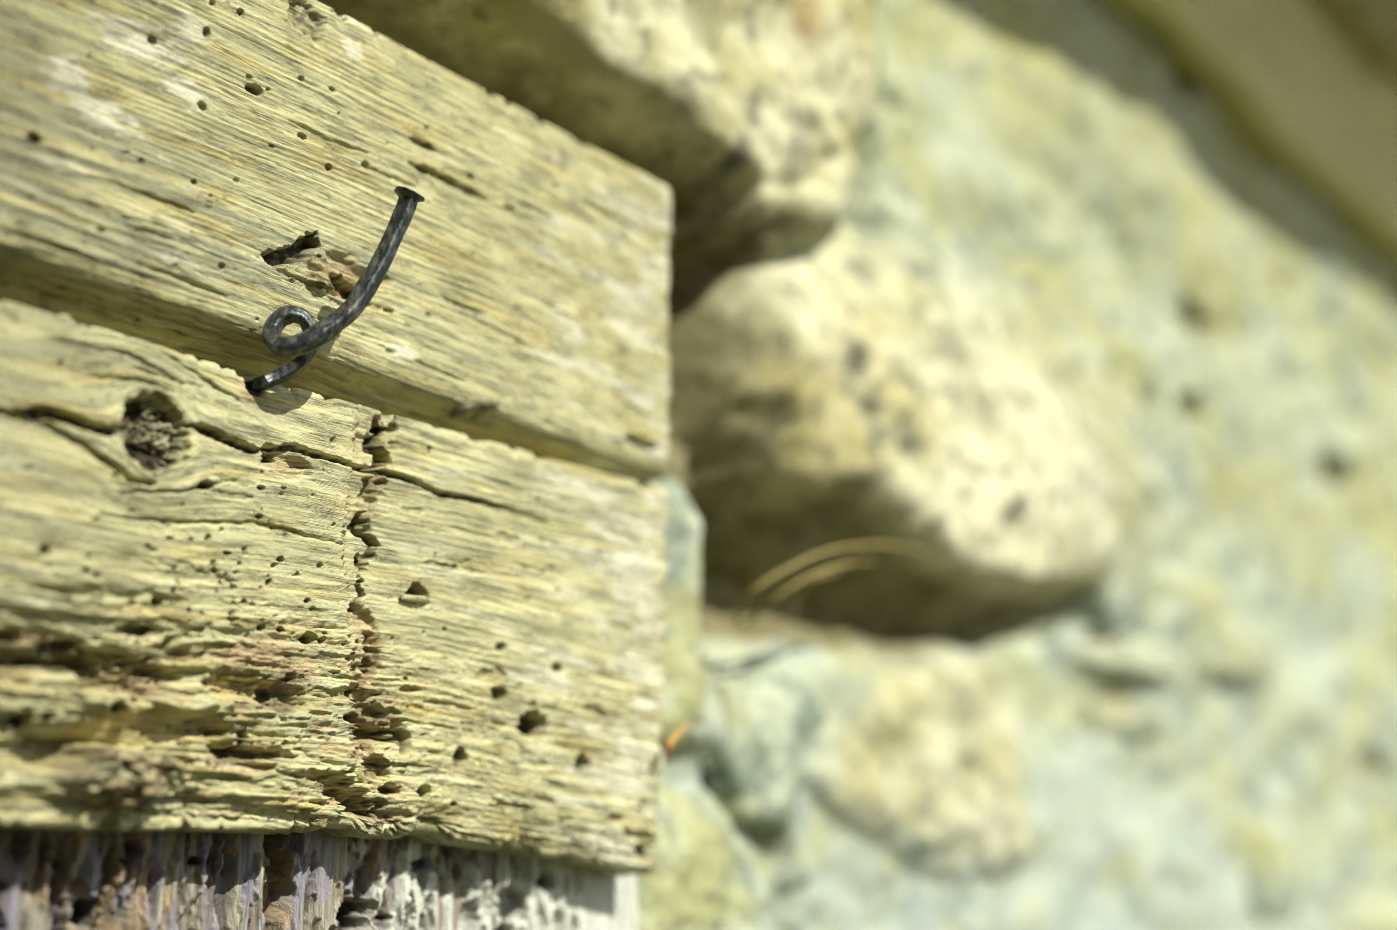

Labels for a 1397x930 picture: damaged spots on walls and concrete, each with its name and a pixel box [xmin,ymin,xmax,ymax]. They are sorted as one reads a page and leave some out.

crack [179,421,549,524]
crack [218,727,254,756]